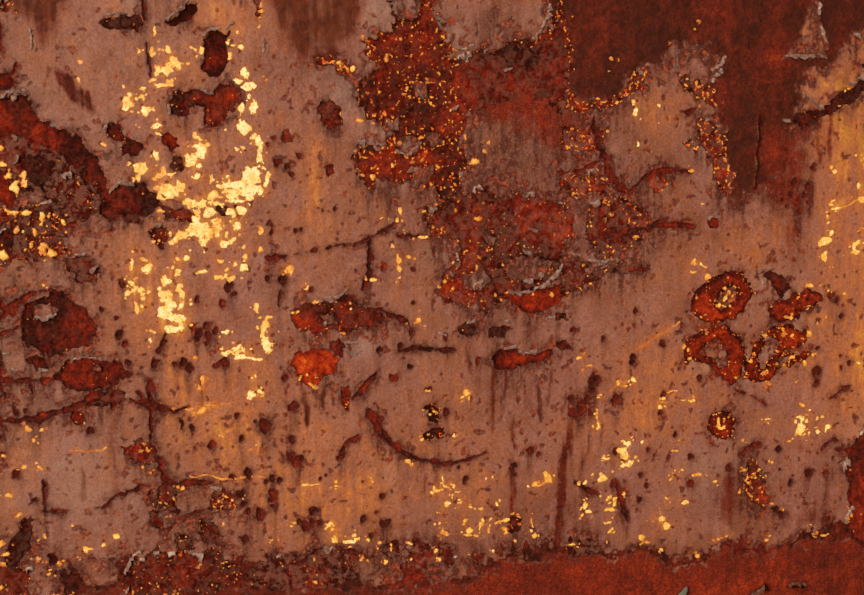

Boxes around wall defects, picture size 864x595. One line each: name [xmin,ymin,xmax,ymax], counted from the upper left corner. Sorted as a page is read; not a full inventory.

rust [46,65,100,117]
peeling [677,72,738,196]
peeling [782,64,864,131]
peeling [313,0,651,430]
crack [0,289,53,337]
peeling [20,283,132,434]
crack [0,365,238,520]
peeling [281,283,385,389]
crack [265,223,457,354]
crack [336,372,487,466]
rust [212,363,864,595]
rust [684,270,823,385]